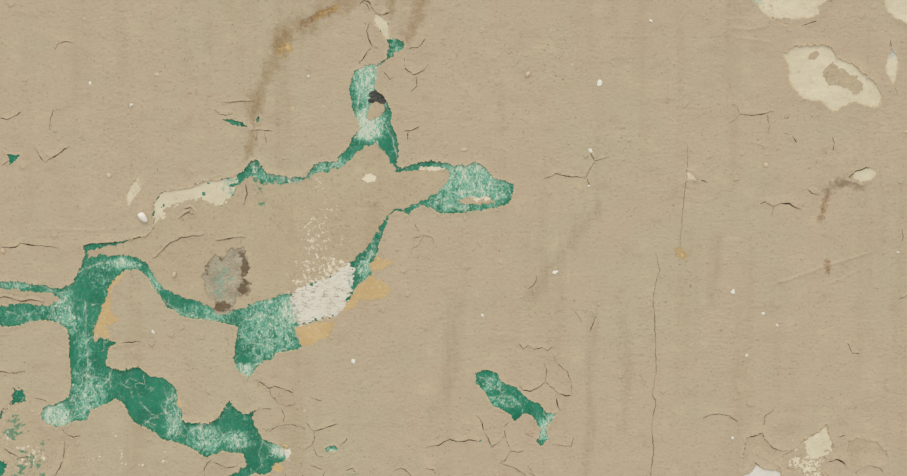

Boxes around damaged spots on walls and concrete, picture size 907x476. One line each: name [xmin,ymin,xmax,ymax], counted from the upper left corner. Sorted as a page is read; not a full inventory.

peeling [741,0,907,118]
peeling [0,8,520,476]
peeling [471,365,562,451]
peeling [733,420,838,476]